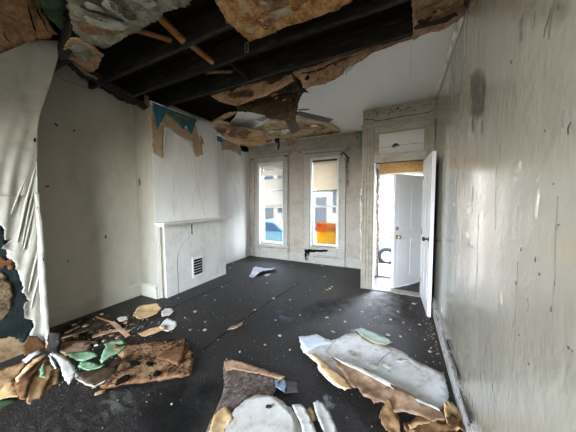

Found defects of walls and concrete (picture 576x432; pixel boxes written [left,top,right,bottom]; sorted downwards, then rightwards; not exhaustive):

flaking render [0,0,191,54]
flaking render [411,0,467,41]
peeling [145,102,206,158]
peeling [217,136,248,155]
peeling [260,118,341,146]